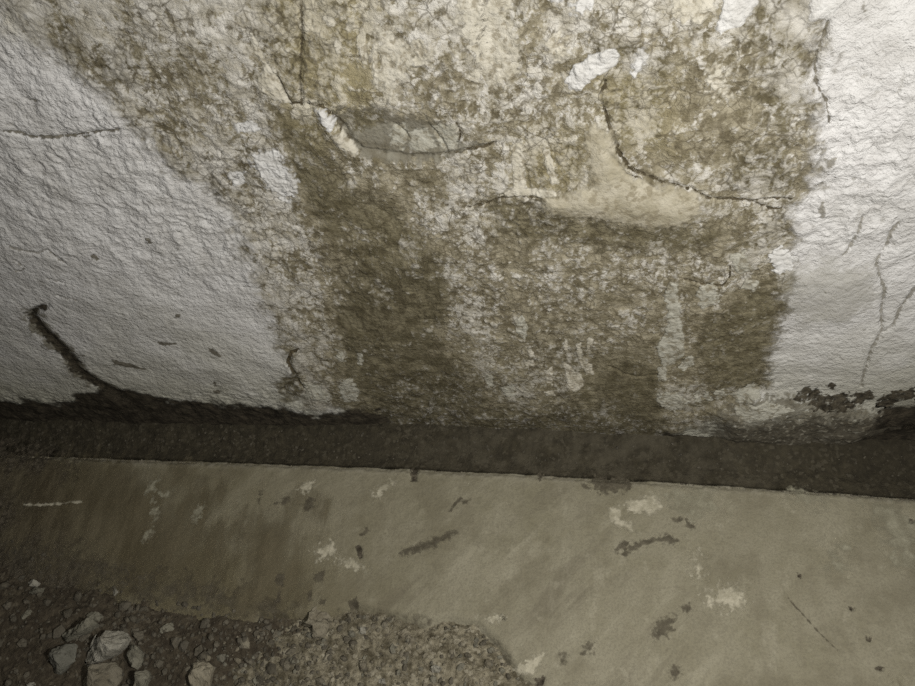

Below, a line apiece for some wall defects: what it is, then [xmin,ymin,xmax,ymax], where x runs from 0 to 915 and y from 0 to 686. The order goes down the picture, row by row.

crack [3,128,120,139]
crack [278,0,386,153]
crack [411,122,494,156]
crack [600,80,793,210]
leakage [0,0,915,446]
crack [21,305,133,404]